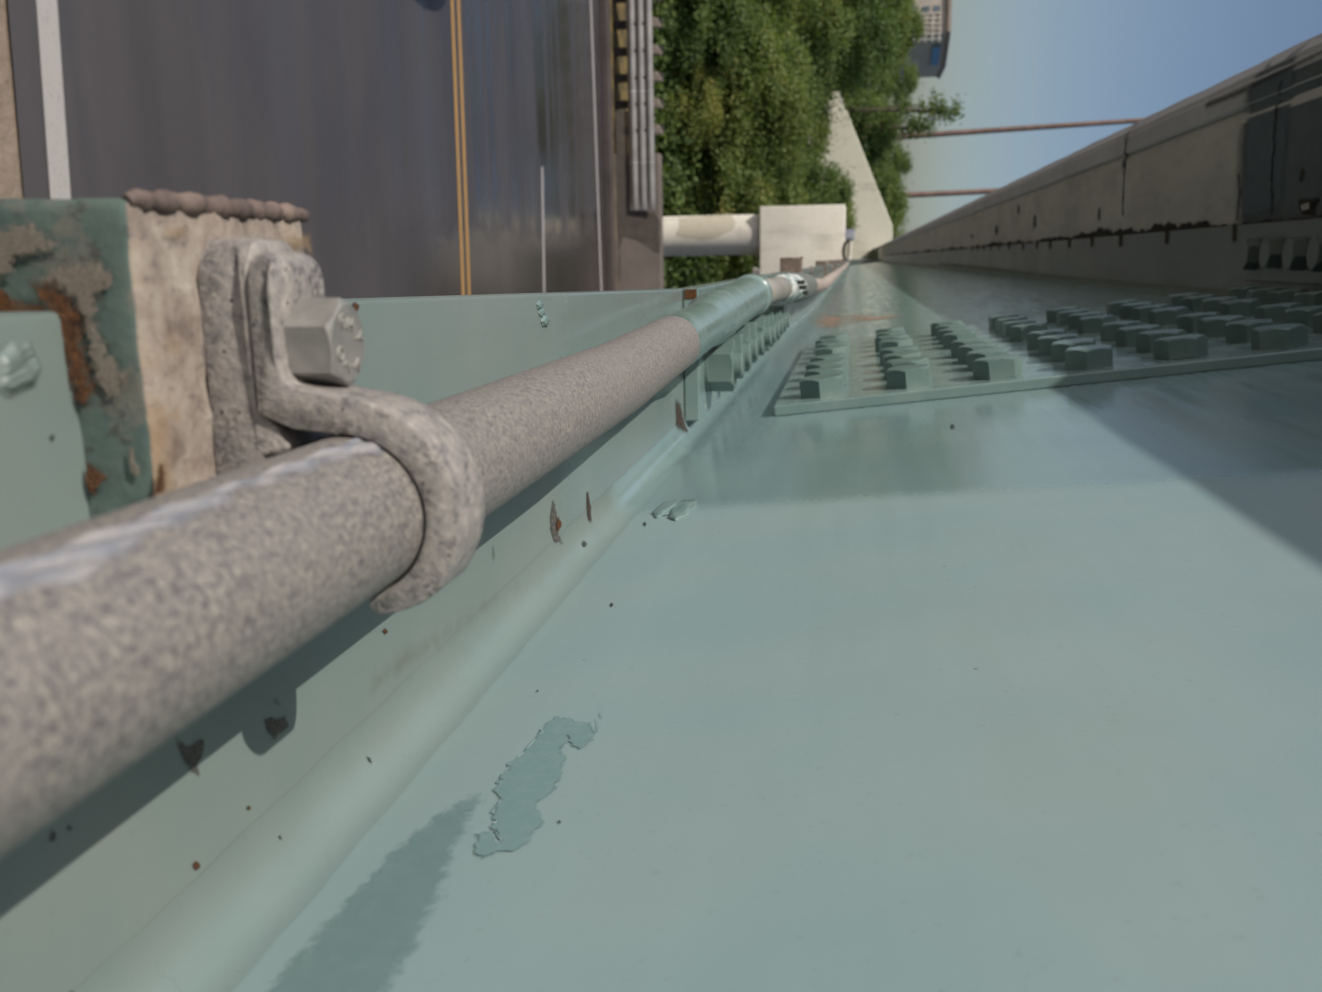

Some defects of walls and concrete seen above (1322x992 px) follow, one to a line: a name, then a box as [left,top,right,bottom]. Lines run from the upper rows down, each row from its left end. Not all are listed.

rust [0,282,98,406]
peeling [0,218,130,399]
rust [550,502,562,542]
peeling [265,701,288,739]
peeling [271,712,602,992]